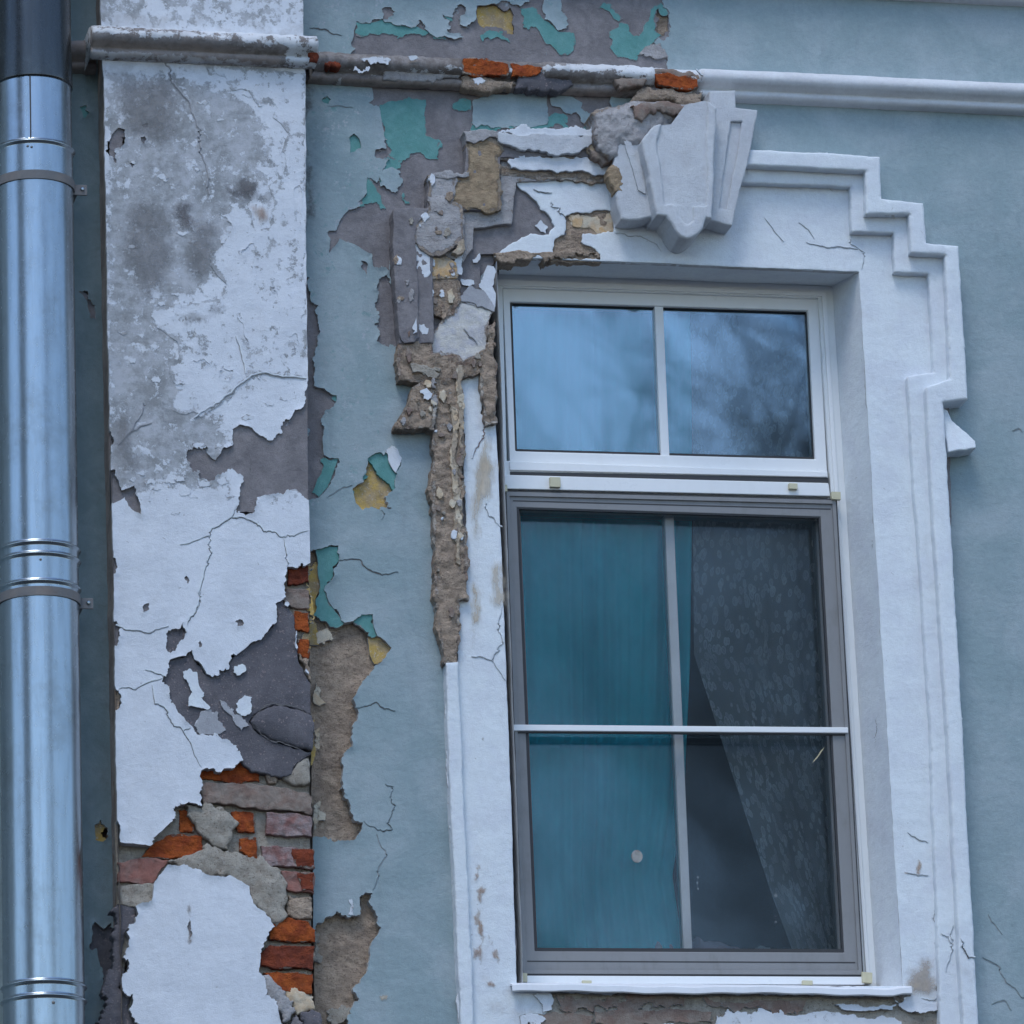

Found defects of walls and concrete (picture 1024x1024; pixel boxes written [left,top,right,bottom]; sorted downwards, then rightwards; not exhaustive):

peeling [351,0,671,74]
crack [165,63,210,194]
peeling [108,64,339,514]
crack [765,217,866,269]
crack [194,336,306,418]
peeling [328,77,692,668]
crack [116,467,308,634]
crack [118,669,202,768]
flaking render [89,547,391,1024]
crack [364,783,396,891]
flaking render [520,992,938,1024]
crack [920,910,1024,1010]